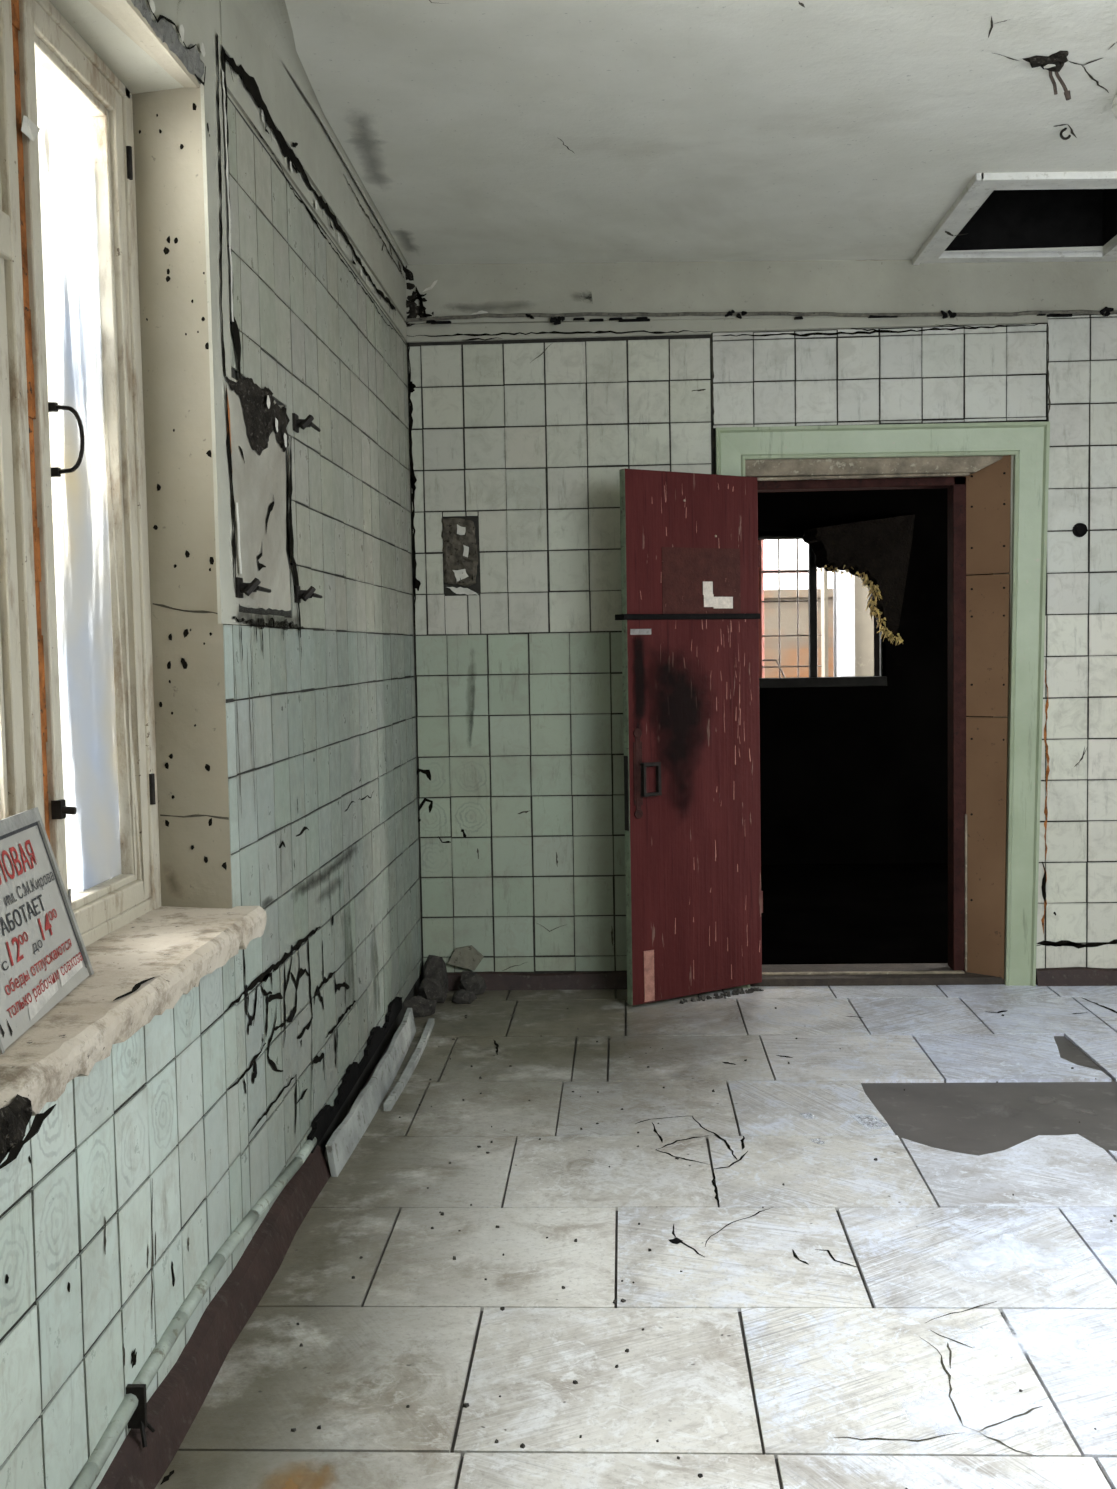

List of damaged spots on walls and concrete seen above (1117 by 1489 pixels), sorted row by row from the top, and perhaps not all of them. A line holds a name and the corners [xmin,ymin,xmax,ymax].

spalling [131,0,206,85]
peeling [163,236,178,282]
flaking render [206,377,301,638]
crack [228,927,356,1136]
spalling [0,1094,56,1169]
crack [635,1116,773,1257]
crack [792,1249,859,1268]
crack [848,1301,1042,1456]